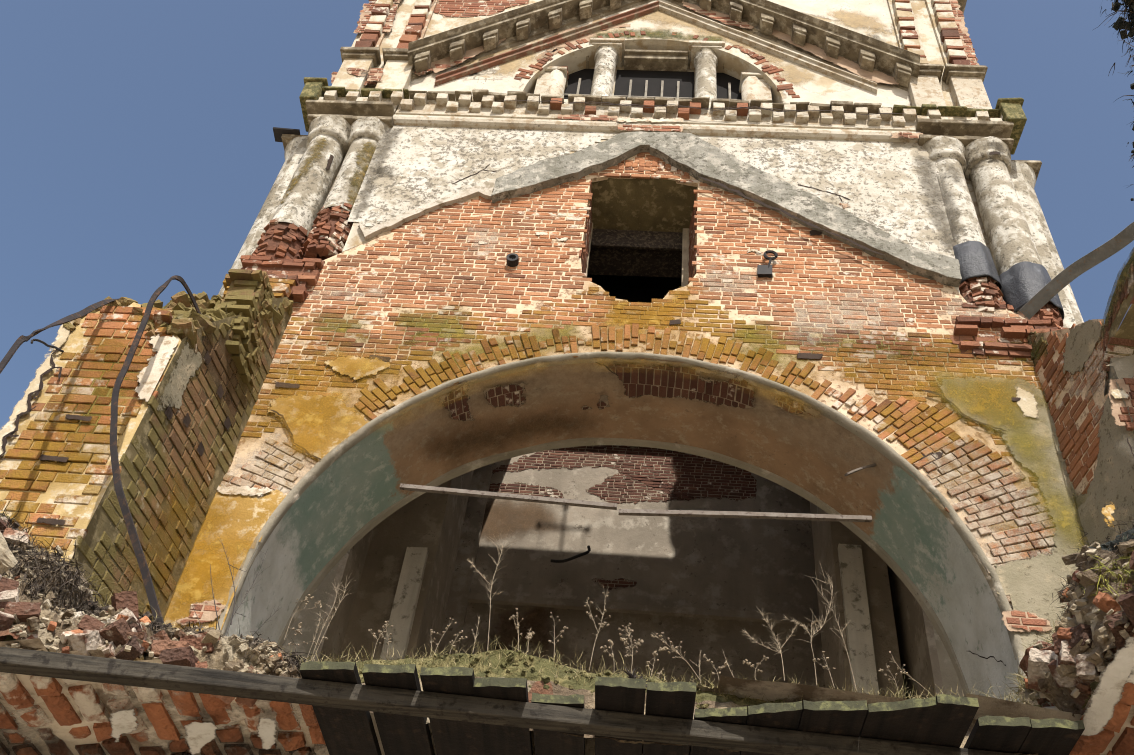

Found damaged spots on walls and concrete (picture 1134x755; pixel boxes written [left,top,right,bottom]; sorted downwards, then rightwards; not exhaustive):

flaking render [353,0,377,34]
flaking render [432,0,529,18]
flaking render [604,363,756,409]
flaking render [1111,389,1129,399]
flaking render [217,485,272,497]
leakage [435,416,579,457]
flaking render [489,445,757,504]
leakage [907,366,1084,547]
spalling [0,517,302,679]
spalling [1002,539,1134,720]
spalling [419,650,613,709]
spalling [960,719,977,748]